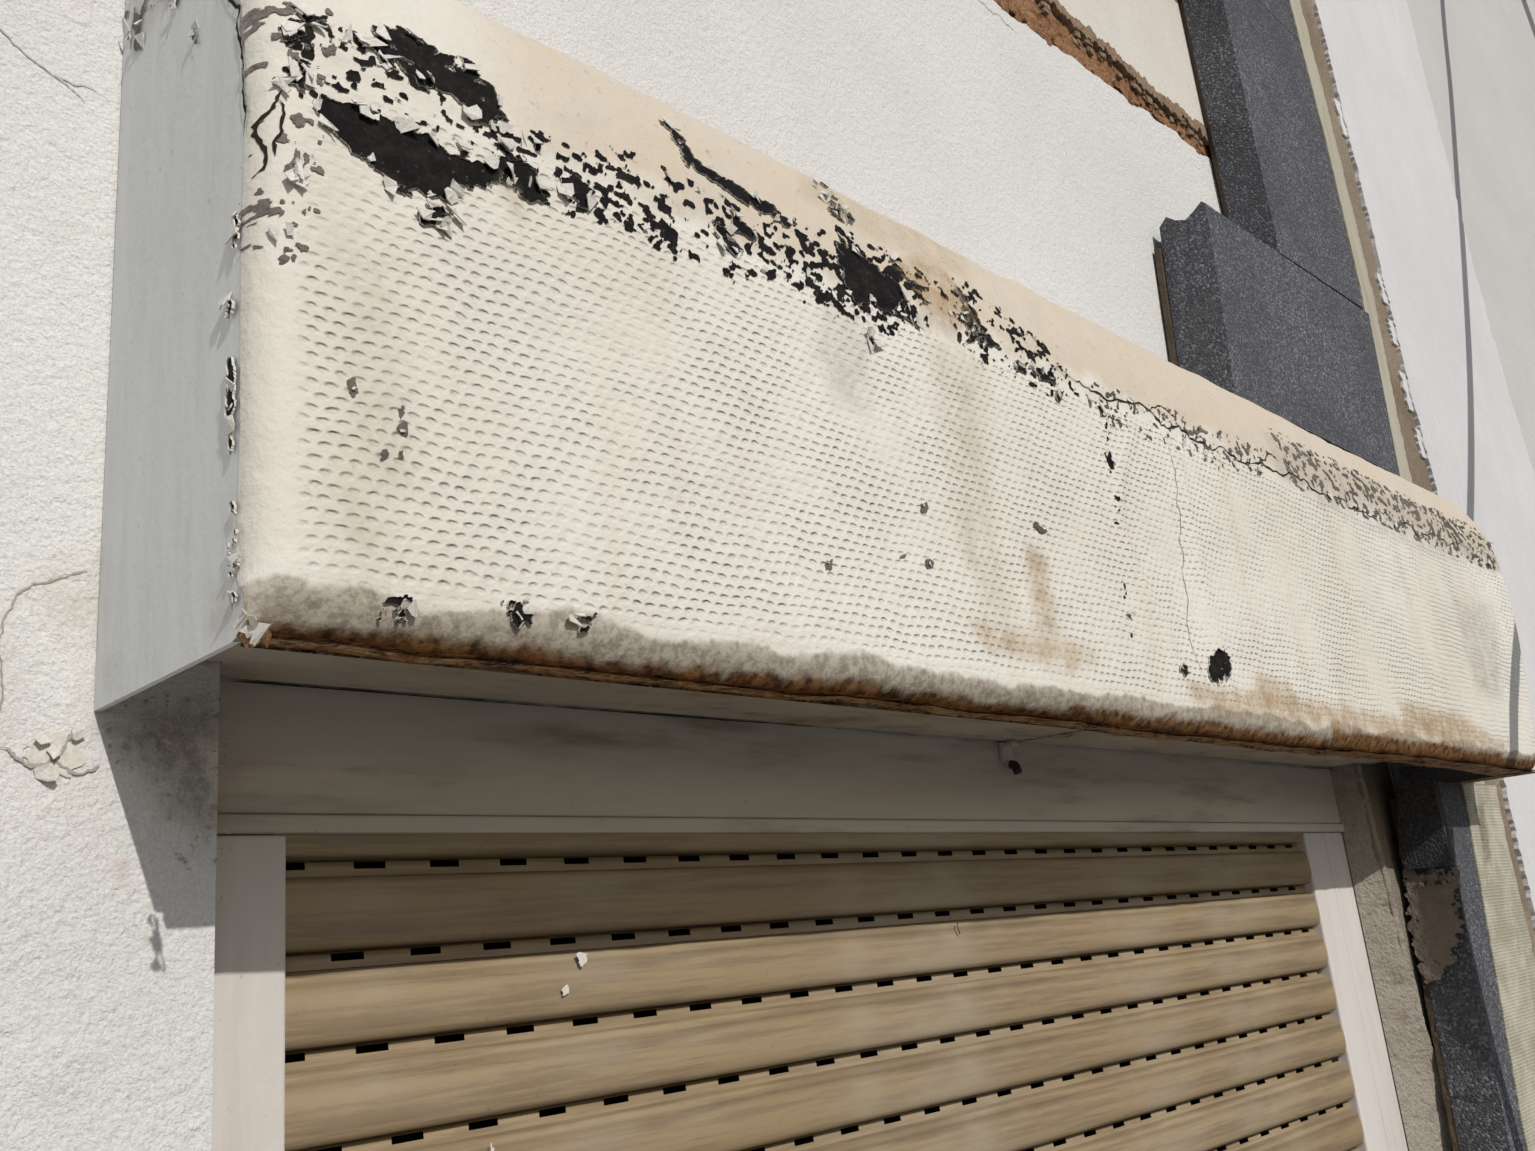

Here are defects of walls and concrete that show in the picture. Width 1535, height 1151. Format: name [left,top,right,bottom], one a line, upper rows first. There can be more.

peeling [122,0,178,51]
peeling [188,19,199,44]
peeling [218,292,235,319]
peeling [224,0,1499,570]
spalling [226,501,272,649]
crack [0,571,86,710]
peeling [377,594,418,623]
peeling [501,595,534,629]
peeling [568,612,598,632]
peeling [1180,644,1233,686]
flaking render [1,728,100,782]